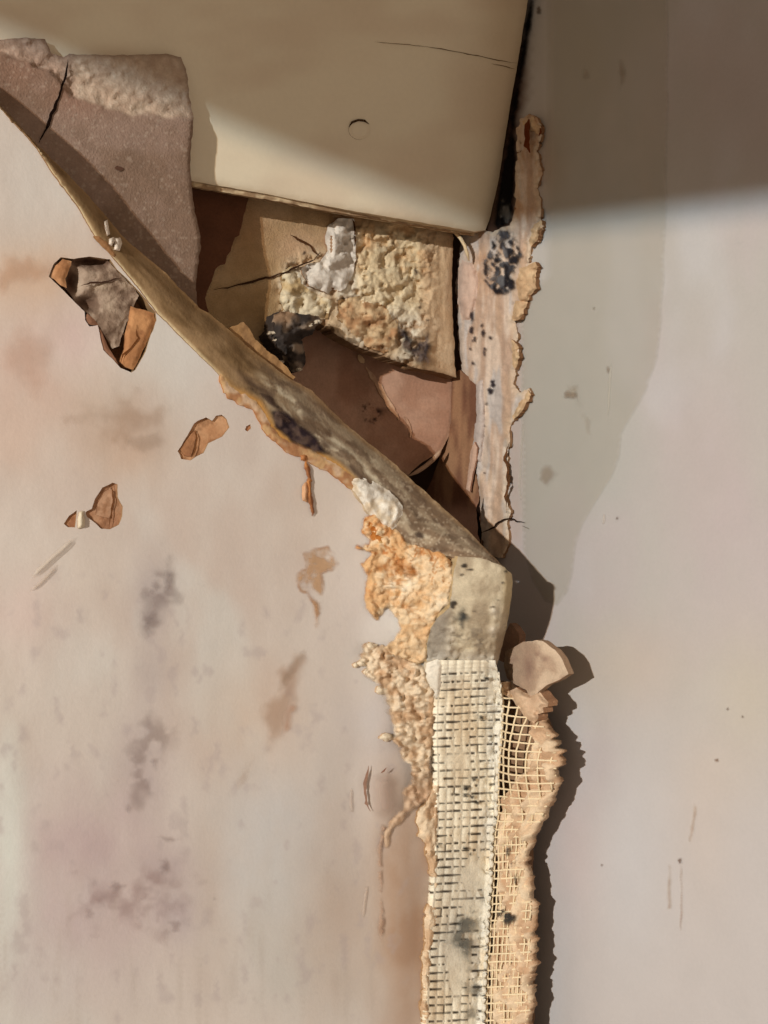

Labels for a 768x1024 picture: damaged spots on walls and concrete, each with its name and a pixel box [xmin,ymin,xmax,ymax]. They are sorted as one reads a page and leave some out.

crack [380,42,513,69]
crack [39,62,68,143]
water stain [483,1,540,294]
peeling [529,220,546,247]
crack [214,235,320,290]
spalling [205,198,456,379]
peeling [512,262,543,321]
peeling [511,339,524,370]
peeling [178,415,228,460]
water stain [252,389,326,453]
peeling [512,390,535,420]
spalling [504,640,574,696]